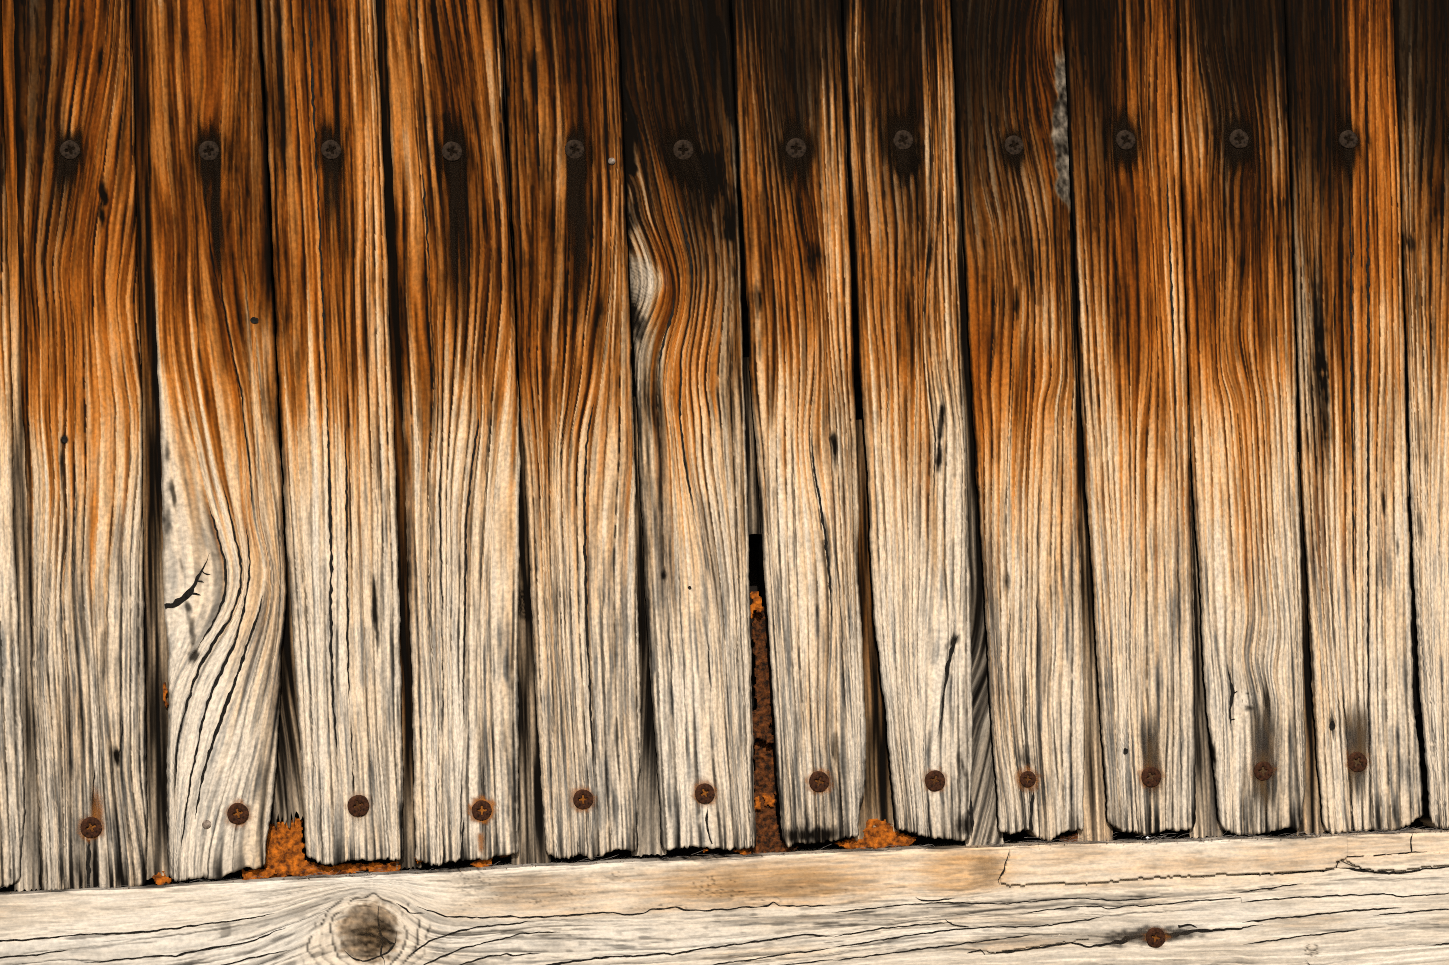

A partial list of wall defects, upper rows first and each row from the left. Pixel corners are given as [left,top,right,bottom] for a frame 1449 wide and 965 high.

crack [164,488,263,845]
rust [733,591,799,855]
rust [242,817,422,880]
rust [468,797,511,867]
rust [835,819,917,849]
crack [344,789,1449,965]
crack [0,913,287,965]